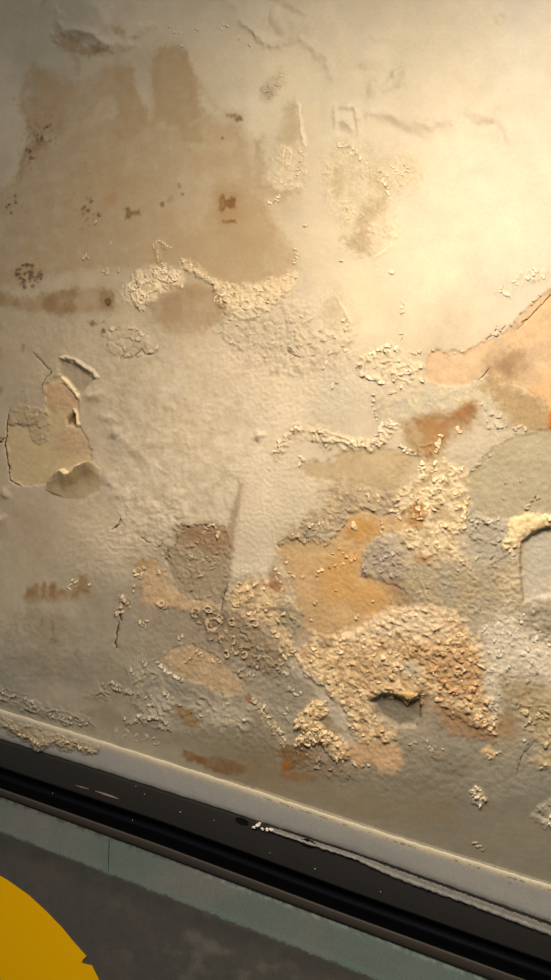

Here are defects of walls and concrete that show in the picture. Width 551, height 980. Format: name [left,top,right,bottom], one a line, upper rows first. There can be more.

damp [0,21,307,295]
spalling [0,354,102,500]
flaking render [112,263,551,642]
peeling [0,678,175,756]
flaking render [154,633,333,770]
flaking render [311,675,551,772]